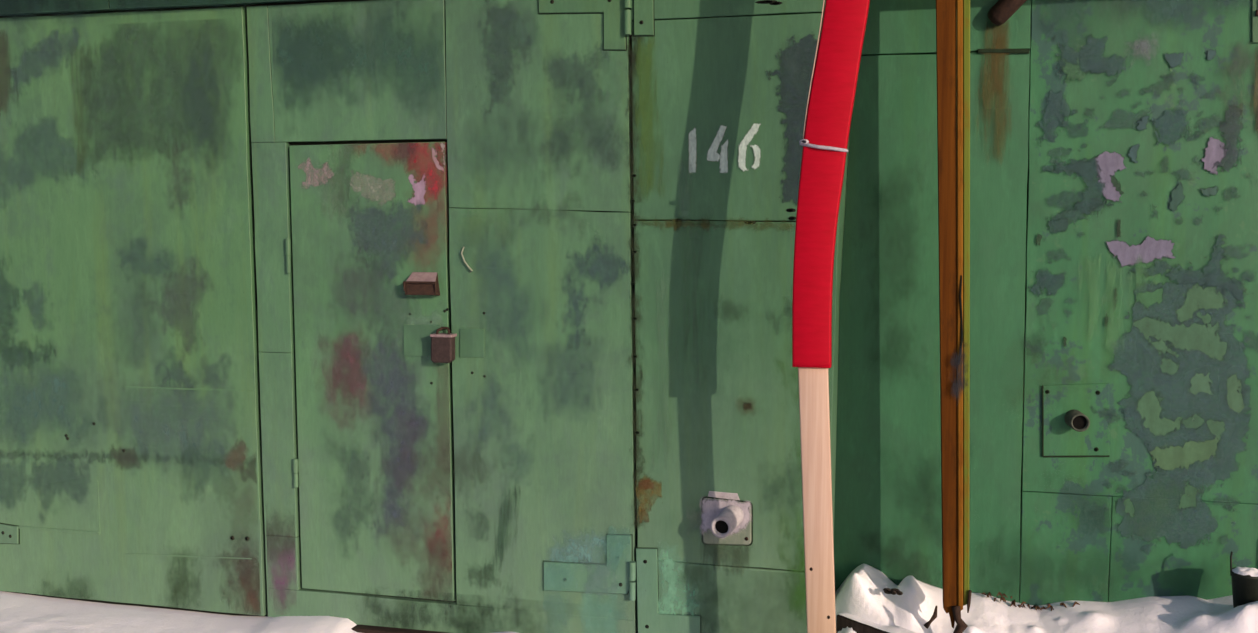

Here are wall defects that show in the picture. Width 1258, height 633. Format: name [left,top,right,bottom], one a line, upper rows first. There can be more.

peeling [299,159,334,189]
peeling [350,143,446,207]
peeling [1042,108,1192,234]
peeling [1200,104,1243,197]
corrosion [631,356,662,525]
peeling [1106,234,1251,549]